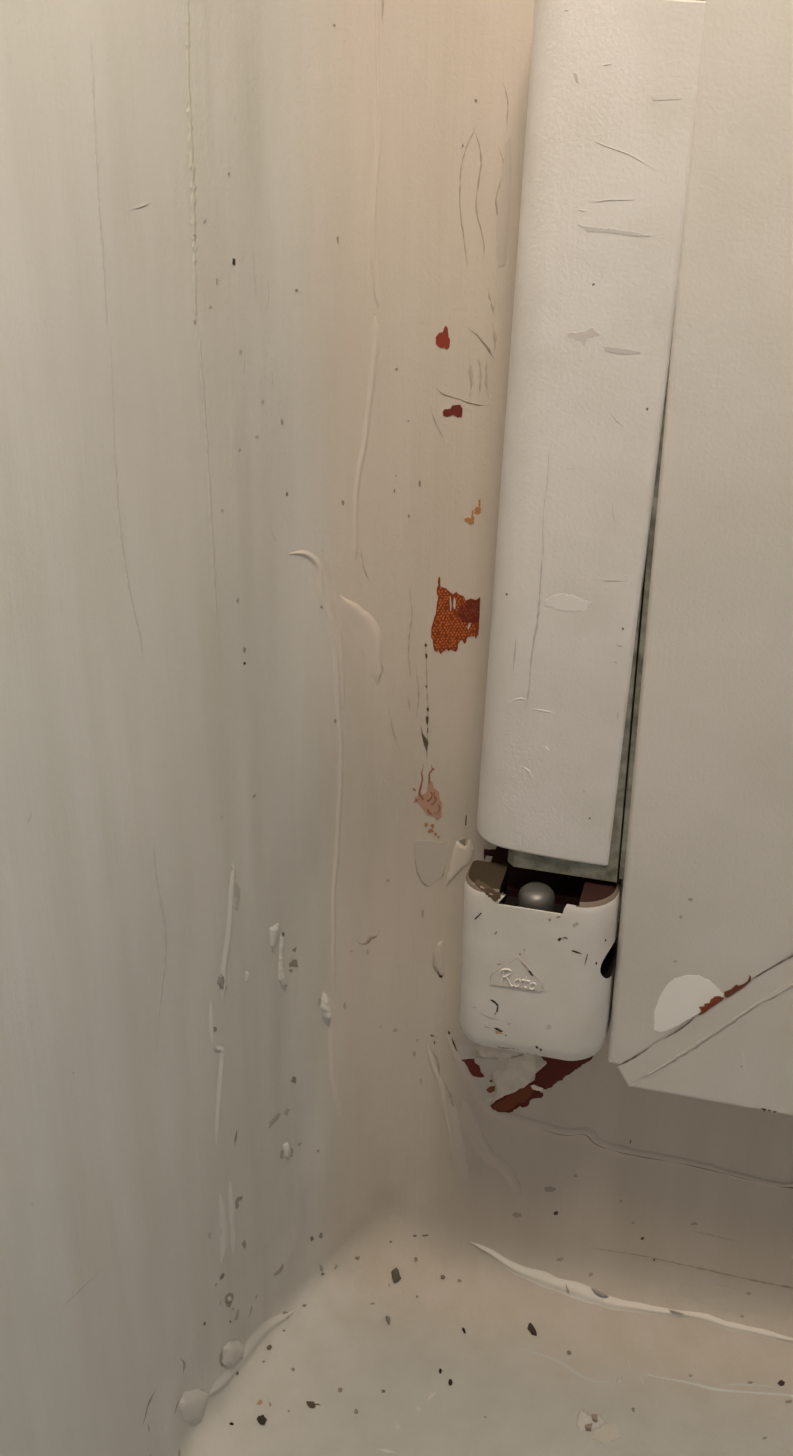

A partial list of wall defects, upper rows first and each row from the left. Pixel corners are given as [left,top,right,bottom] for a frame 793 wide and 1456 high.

peeling [457,1043,547,1103]